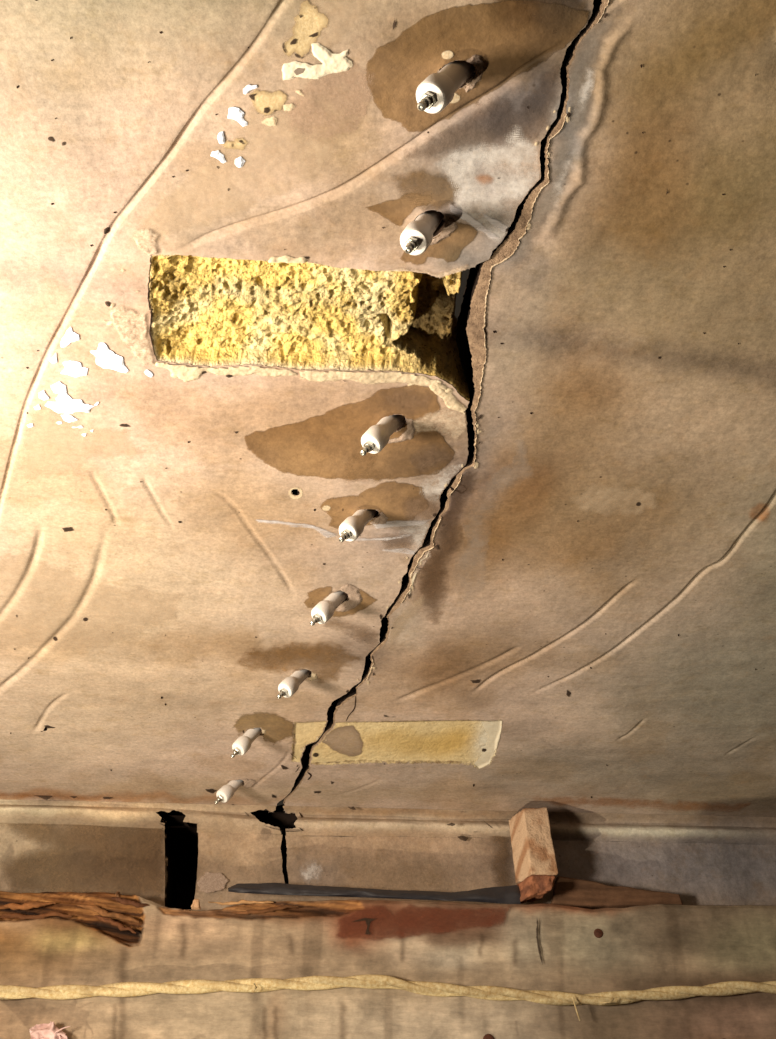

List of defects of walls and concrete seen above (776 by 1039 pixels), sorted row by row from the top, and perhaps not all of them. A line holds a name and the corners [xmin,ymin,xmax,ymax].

spalling [211,0,353,169]
water stain [366,0,601,265]
crack [146,280,154,346]
spalling [27,229,469,436]
water stain [244,384,470,615]
spalling [388,418,415,443]
crack [280,0,610,884]
water stain [239,643,359,679]
water stain [330,589,376,640]
spalling [156,810,190,828]